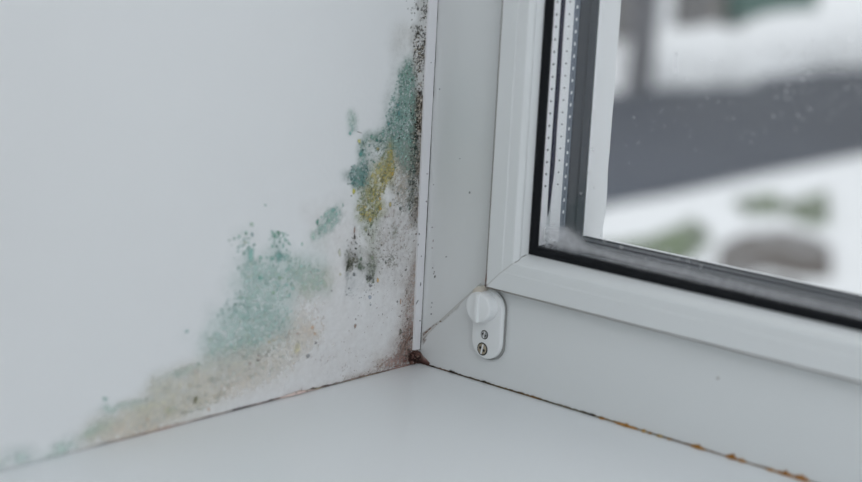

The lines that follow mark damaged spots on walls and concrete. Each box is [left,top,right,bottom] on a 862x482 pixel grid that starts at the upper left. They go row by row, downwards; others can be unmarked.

leakage [84,223,332,439]
leakage [338,0,441,376]